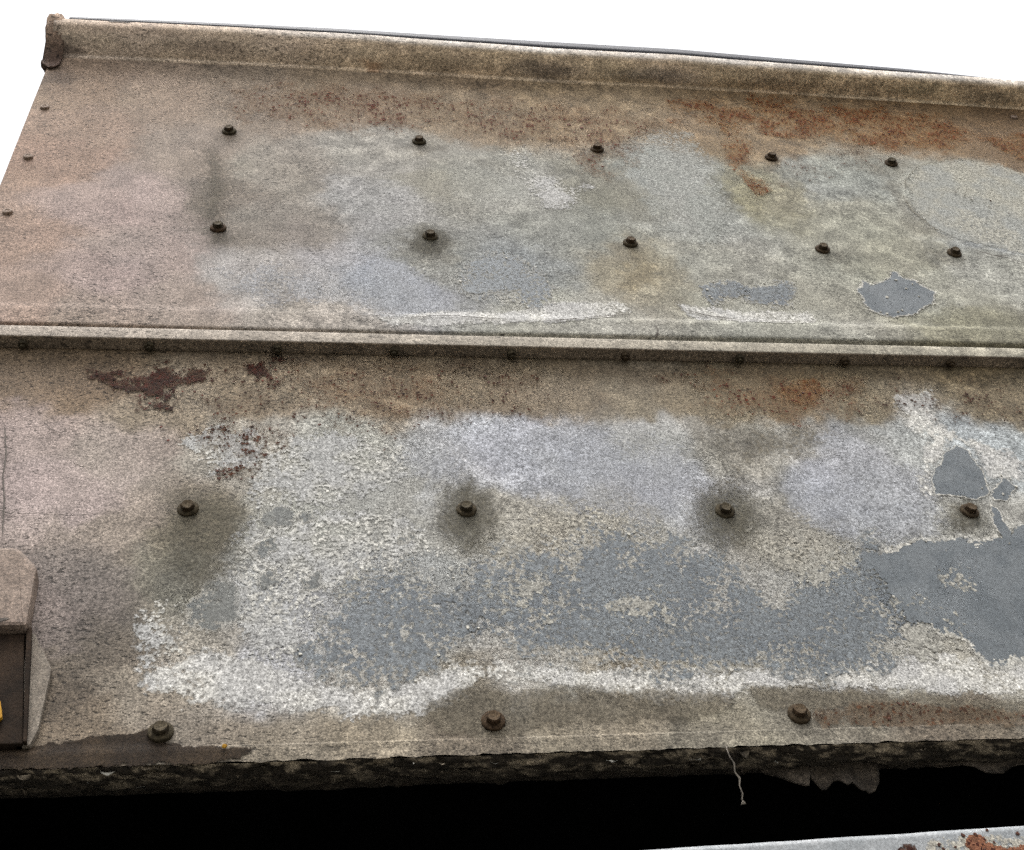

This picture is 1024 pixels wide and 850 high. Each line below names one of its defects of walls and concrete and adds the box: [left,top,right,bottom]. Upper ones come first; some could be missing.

corrosion [219,81,966,194]
peeling [699,279,797,308]
peeling [857,271,937,318]
corrosion [83,357,559,480]
peeling [255,507,314,559]
peeling [260,570,280,589]
leakage [133,423,1024,738]
peeling [293,445,1024,698]
leakage [0,729,251,770]